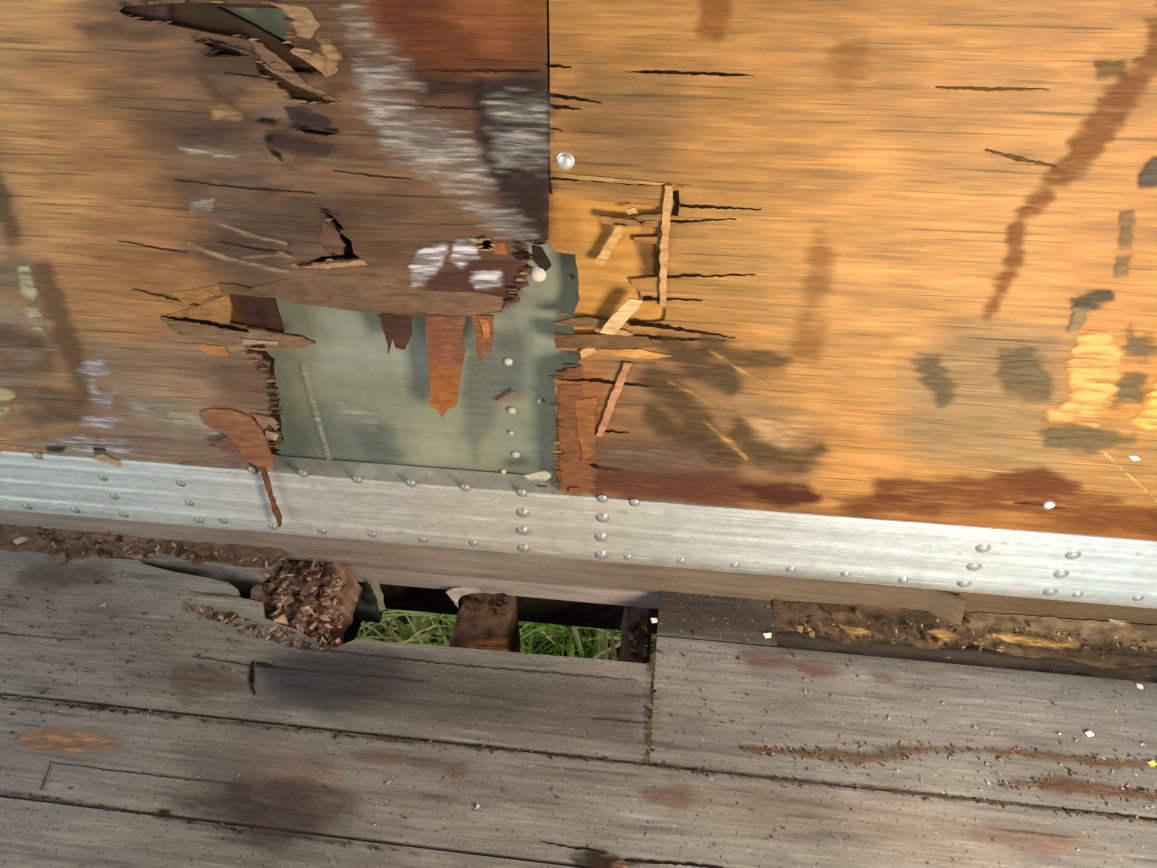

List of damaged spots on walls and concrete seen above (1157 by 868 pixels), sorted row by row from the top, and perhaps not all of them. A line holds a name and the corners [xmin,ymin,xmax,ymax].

peeling [248,4,341,102]
peeling [550,171,692,186]
damp [986,21,1157,313]
peeling [600,207,663,226]
peeling [291,217,367,269]
peeling [492,240,552,272]
peeling [580,329,674,359]
peeling [252,412,281,441]
peeling [575,397,597,461]
peeling [179,436,251,468]
crack [853,786,1157,839]
crack [539,841,724,868]